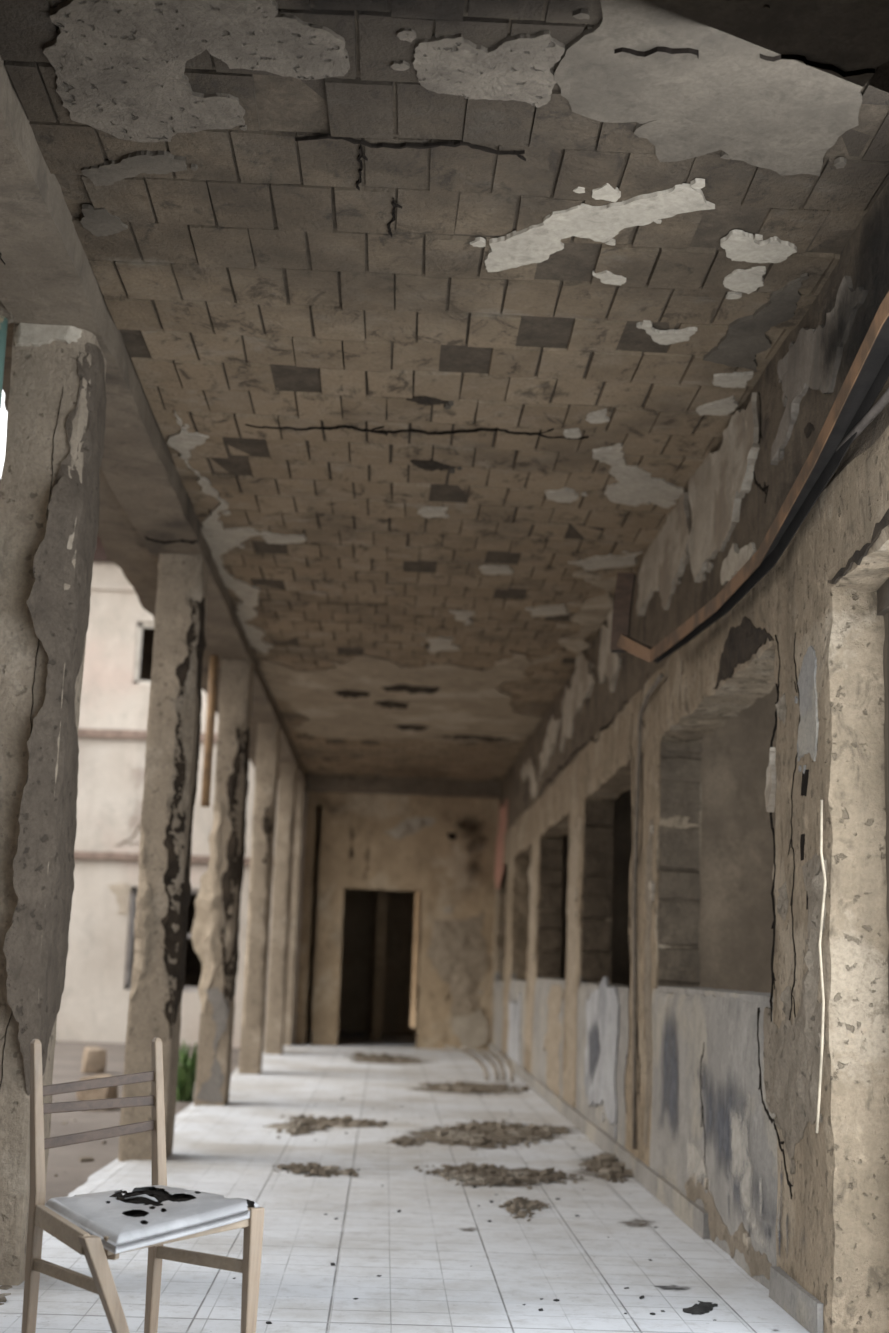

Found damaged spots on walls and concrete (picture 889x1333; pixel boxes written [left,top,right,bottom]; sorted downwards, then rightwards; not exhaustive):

peeling [43,0,350,186]
peeling [390,0,889,176]
peeling [470,178,715,272]
peeling [167,230,862,800]
spalling [828,508,889,584]
spalling [3,323,107,1096]
spalling [108,598,250,1103]
spalling [262,807,273,864]
peeling [494,798,508,890]
peeling [764,747,777,812]
damp [663,1024,678,1131]
damp [688,1074,788,1256]